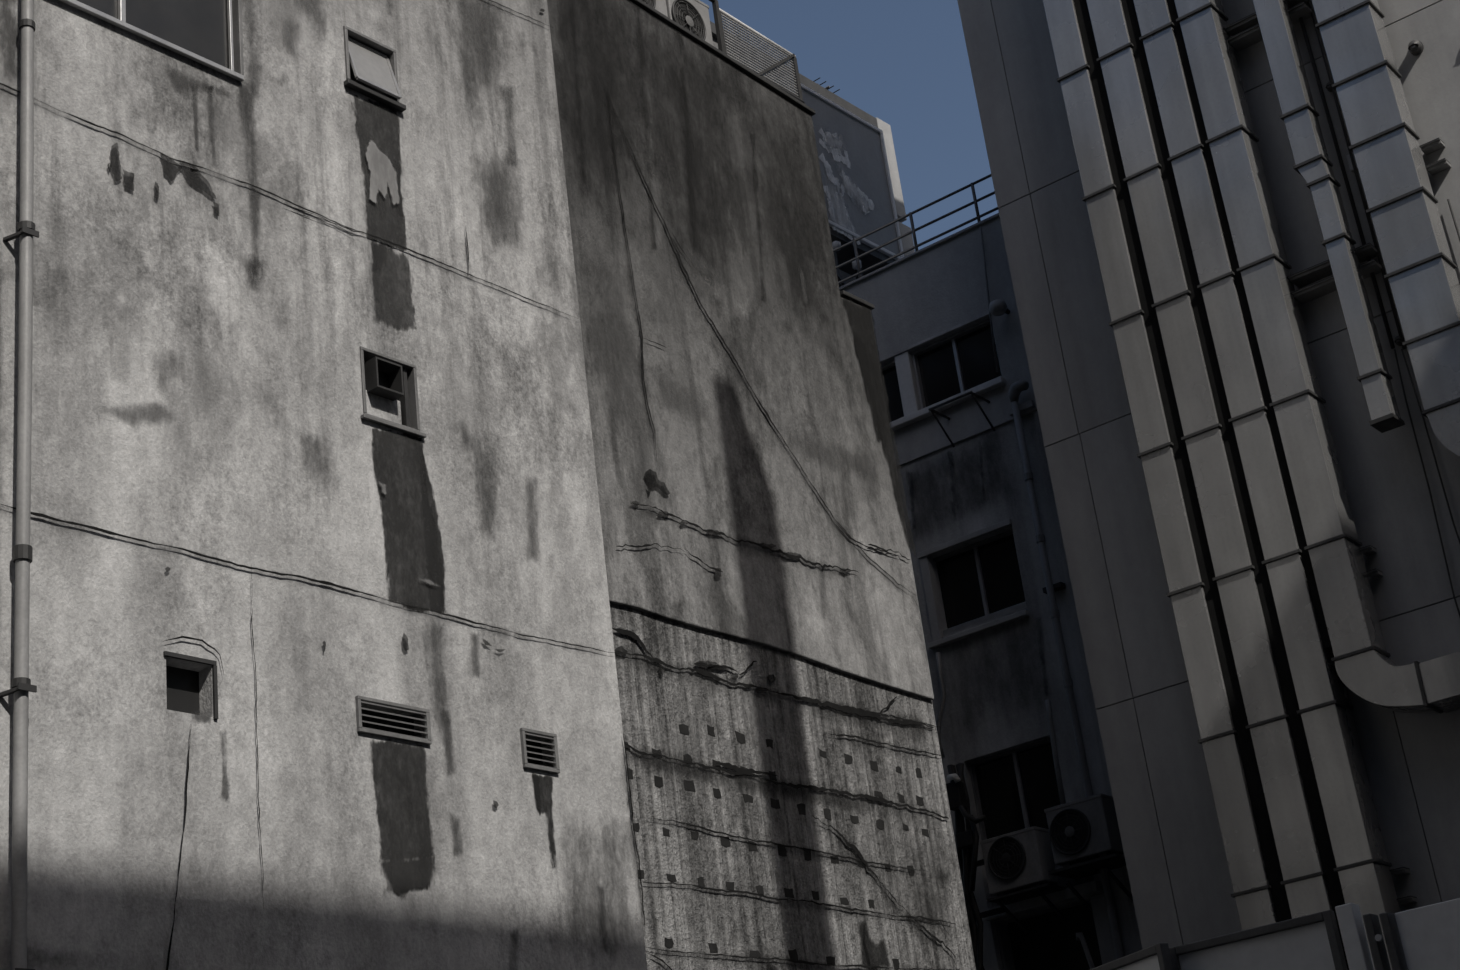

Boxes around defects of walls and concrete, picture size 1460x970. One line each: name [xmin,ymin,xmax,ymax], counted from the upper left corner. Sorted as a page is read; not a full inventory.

peeling [366,141,399,205]
crack [600,76,918,596]
crack [166,729,191,970]
water stain [372,739,434,897]
water stain [372,428,453,773]
water stain [452,818,461,854]
crack [2,504,942,907]
spalling [695,661,738,680]
crack [623,736,959,970]